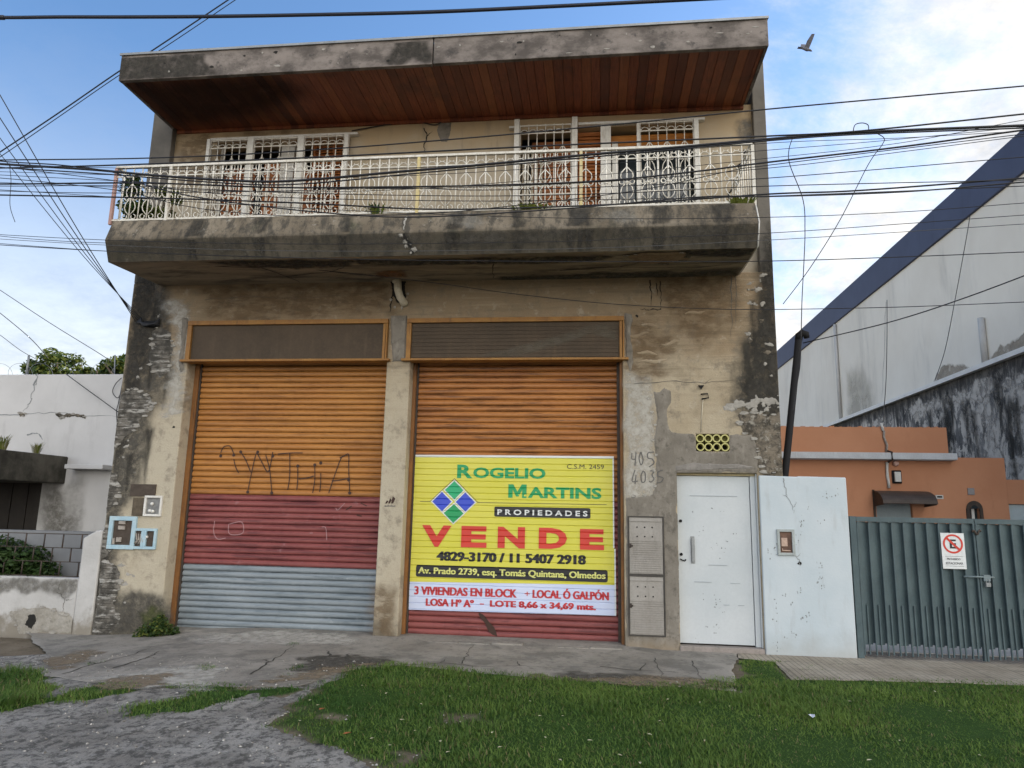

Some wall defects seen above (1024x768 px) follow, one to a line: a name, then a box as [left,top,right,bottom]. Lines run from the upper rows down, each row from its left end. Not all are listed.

leakage [388,41,431,65]
leakage [208,204,780,416]
crack [0,374,57,440]
spalling [114,314,176,458]
leakage [108,277,187,522]
peeling [624,374,658,498]
spalling [723,395,783,475]
leakage [928,396,978,454]
leakage [993,380,1020,475]
leakage [95,549,115,611]
spalling [92,472,135,634]